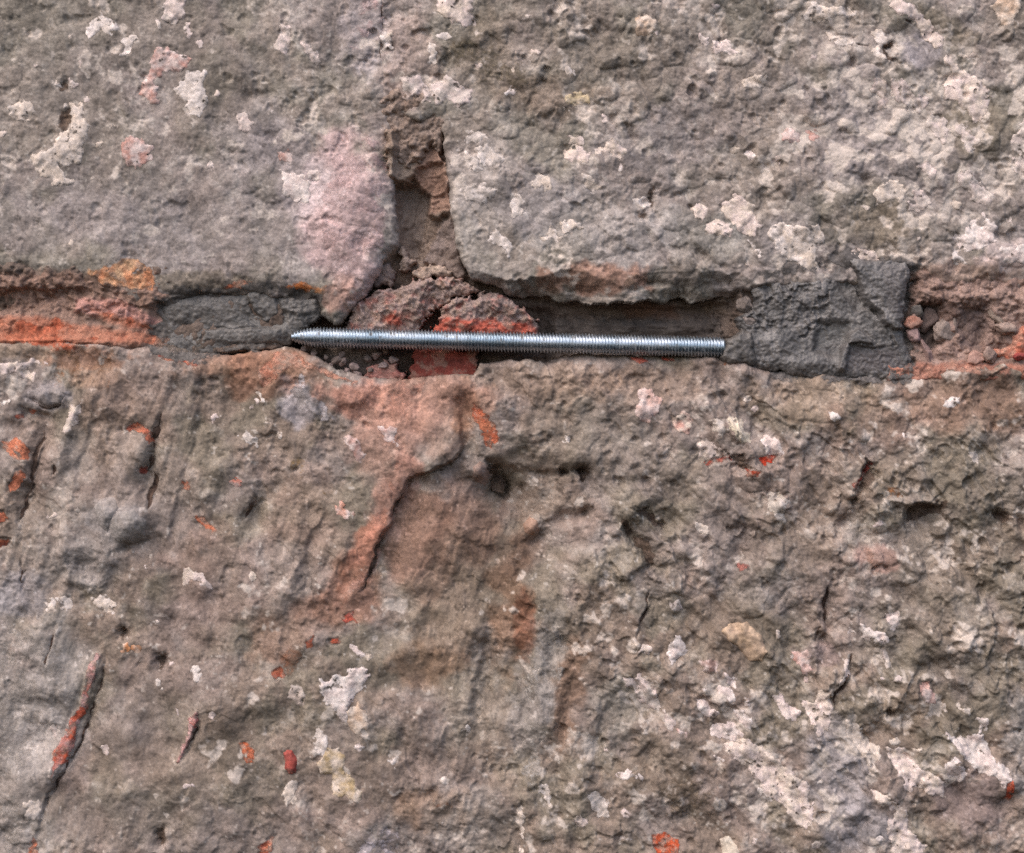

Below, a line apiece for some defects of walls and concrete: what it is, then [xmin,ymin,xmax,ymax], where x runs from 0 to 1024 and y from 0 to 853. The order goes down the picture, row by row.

spalling [286,281,327,295]